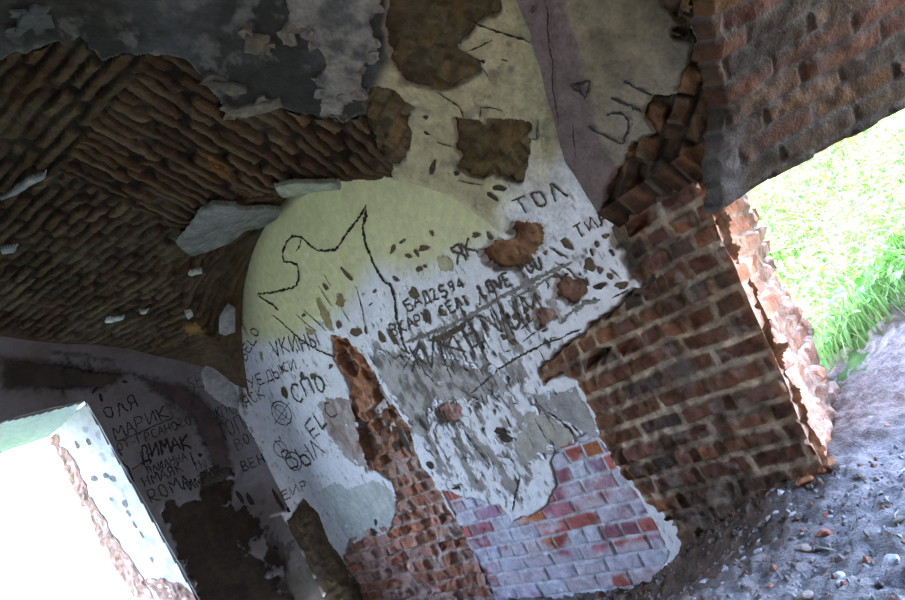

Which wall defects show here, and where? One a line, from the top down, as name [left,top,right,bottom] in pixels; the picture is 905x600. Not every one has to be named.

spalling [0,0,502,396]
spalling [272,0,832,600]
spalling [46,434,290,600]